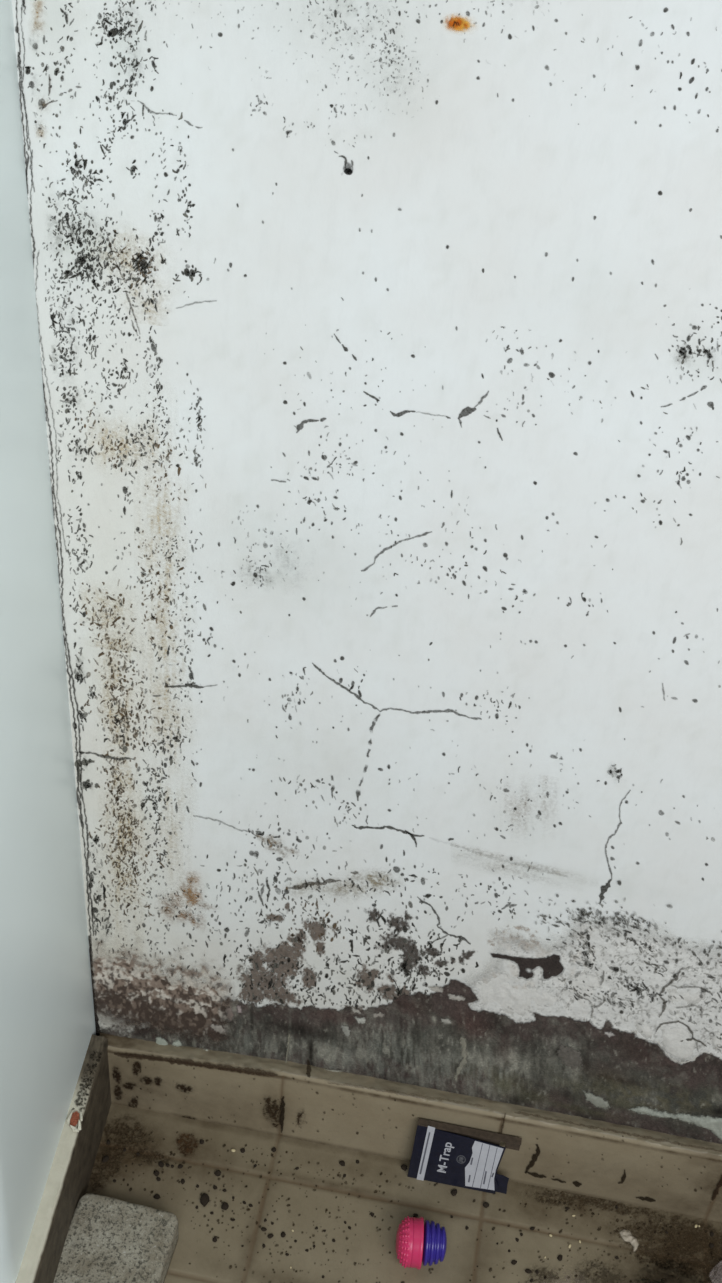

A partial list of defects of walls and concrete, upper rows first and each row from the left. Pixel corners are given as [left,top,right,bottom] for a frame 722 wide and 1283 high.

rust [449,17,470,31]
crack [363,391,415,417]
crack [446,391,503,441]
damp [25,0,722,1048]
crack [361,523,445,571]
crack [312,663,482,847]
crack [599,791,630,903]
flaking render [93,921,722,1144]